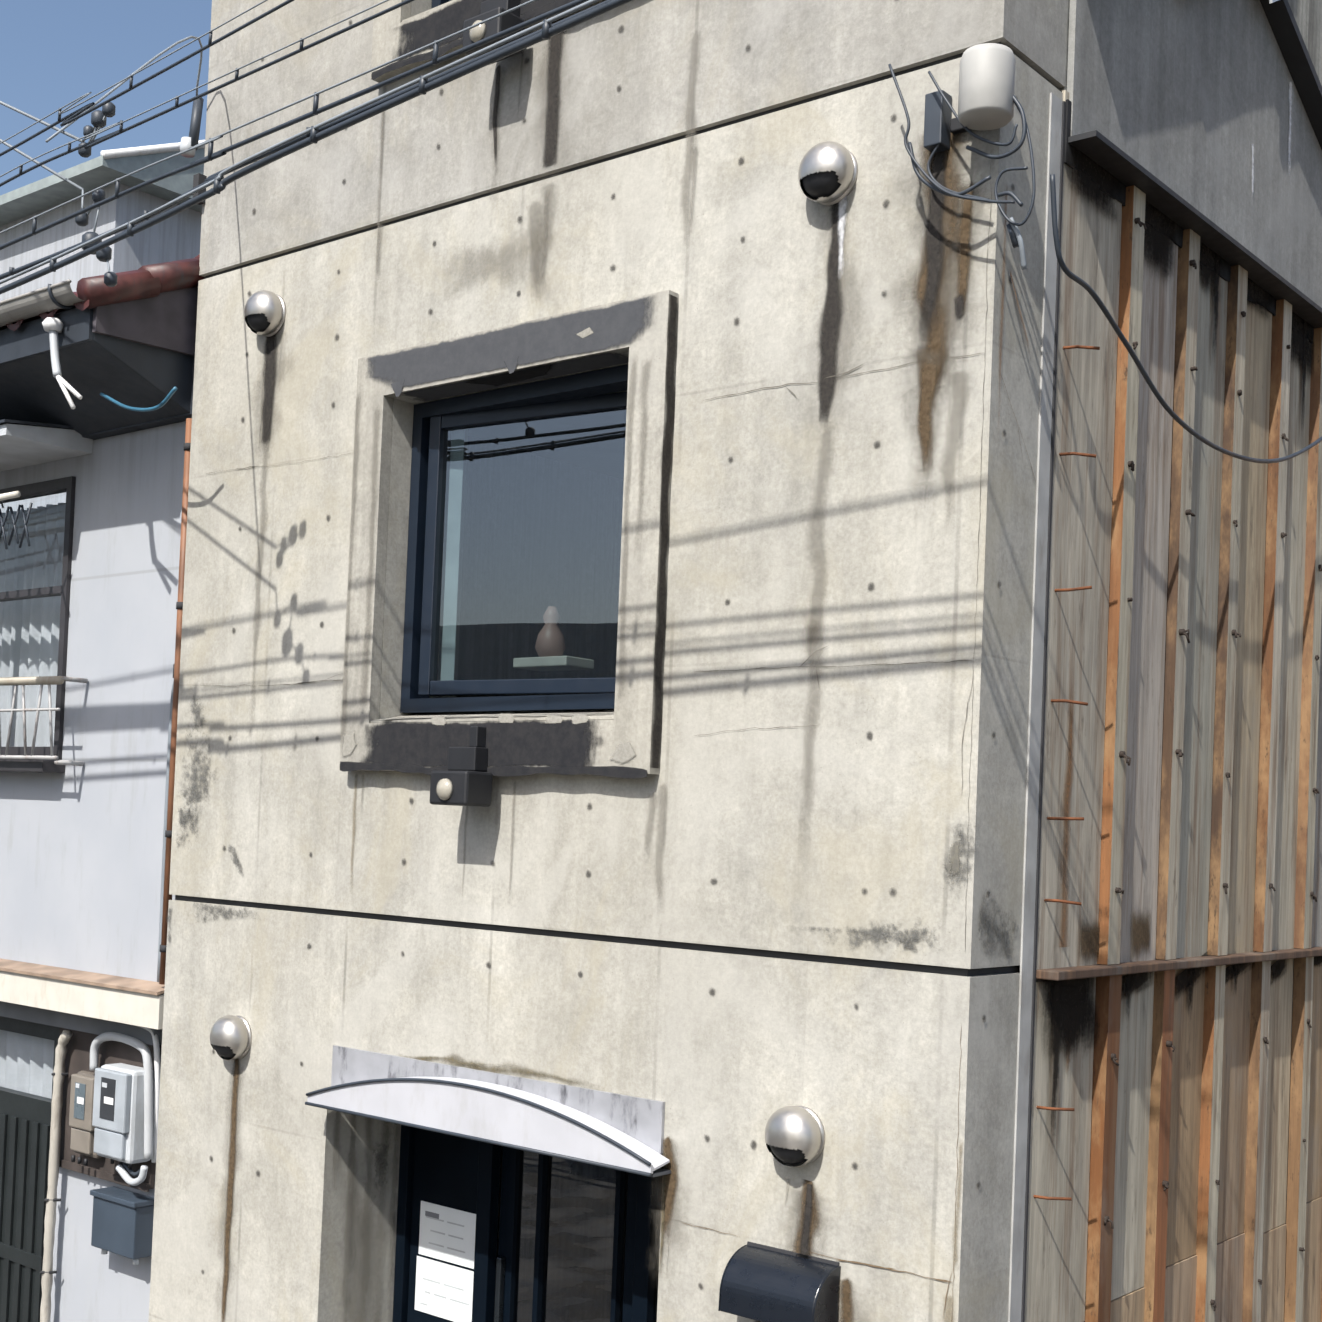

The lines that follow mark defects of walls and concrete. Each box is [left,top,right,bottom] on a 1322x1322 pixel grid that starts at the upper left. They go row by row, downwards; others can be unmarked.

leakage [371,0,487,80]
leakage [520,0,574,166]
leakage [819,196,846,418]
leakage [262,335,276,442]
leakage [179,746,209,838]
rust [1061,712,1100,958]
leakage [1121,972,1153,1014]
rust [1132,913,1151,953]
leakage [1175,951,1208,1006]
leakage [1040,977,1098,1127]
rust [794,1179,818,1259]
rust [841,1279,852,1322]